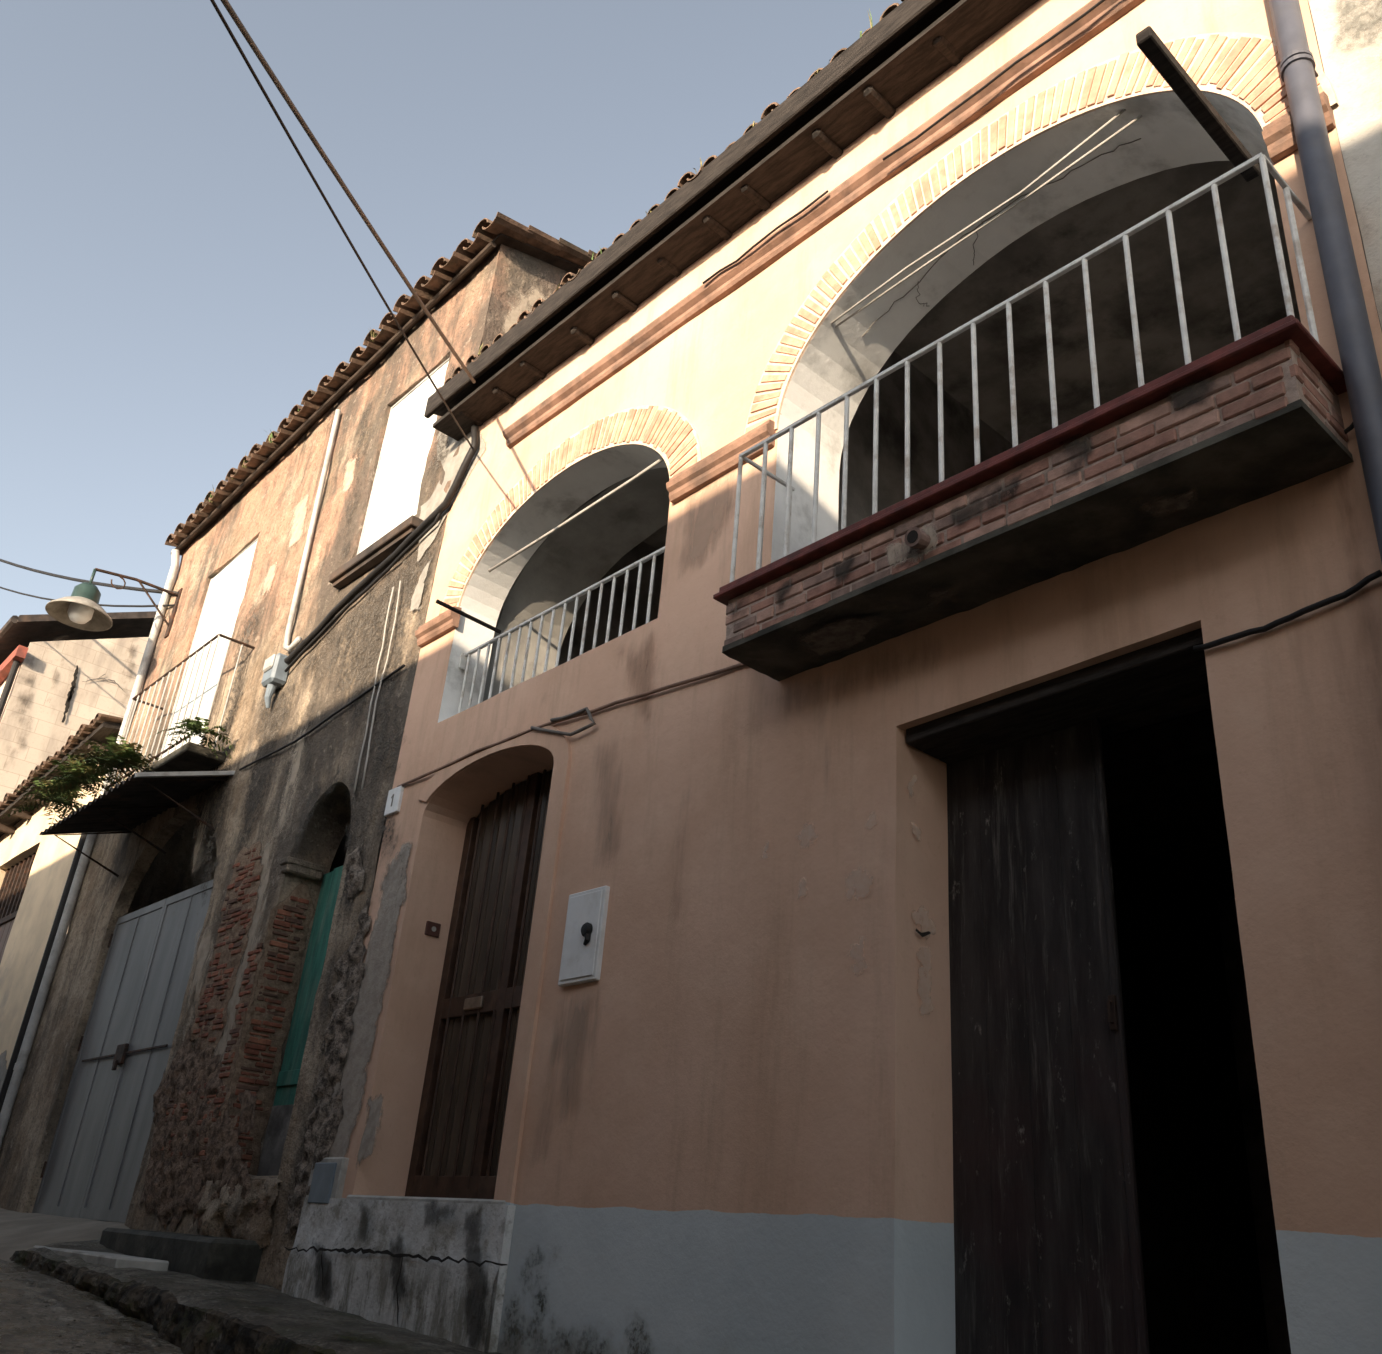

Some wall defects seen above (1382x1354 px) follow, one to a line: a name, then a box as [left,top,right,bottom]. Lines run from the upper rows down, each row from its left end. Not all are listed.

damp [504,290,545,333]
damp [426,416,450,486]
crack [62,665,123,723]
damp [193,604,258,895]
damp [214,530,442,1073]
spalling [139,841,314,1231]
spalling [285,840,412,1237]
damp [360,1206,368,1241]
damp [314,1244,332,1301]
crack [284,1246,507,1324]
damp [390,1237,406,1299]
damp [424,1201,488,1348]